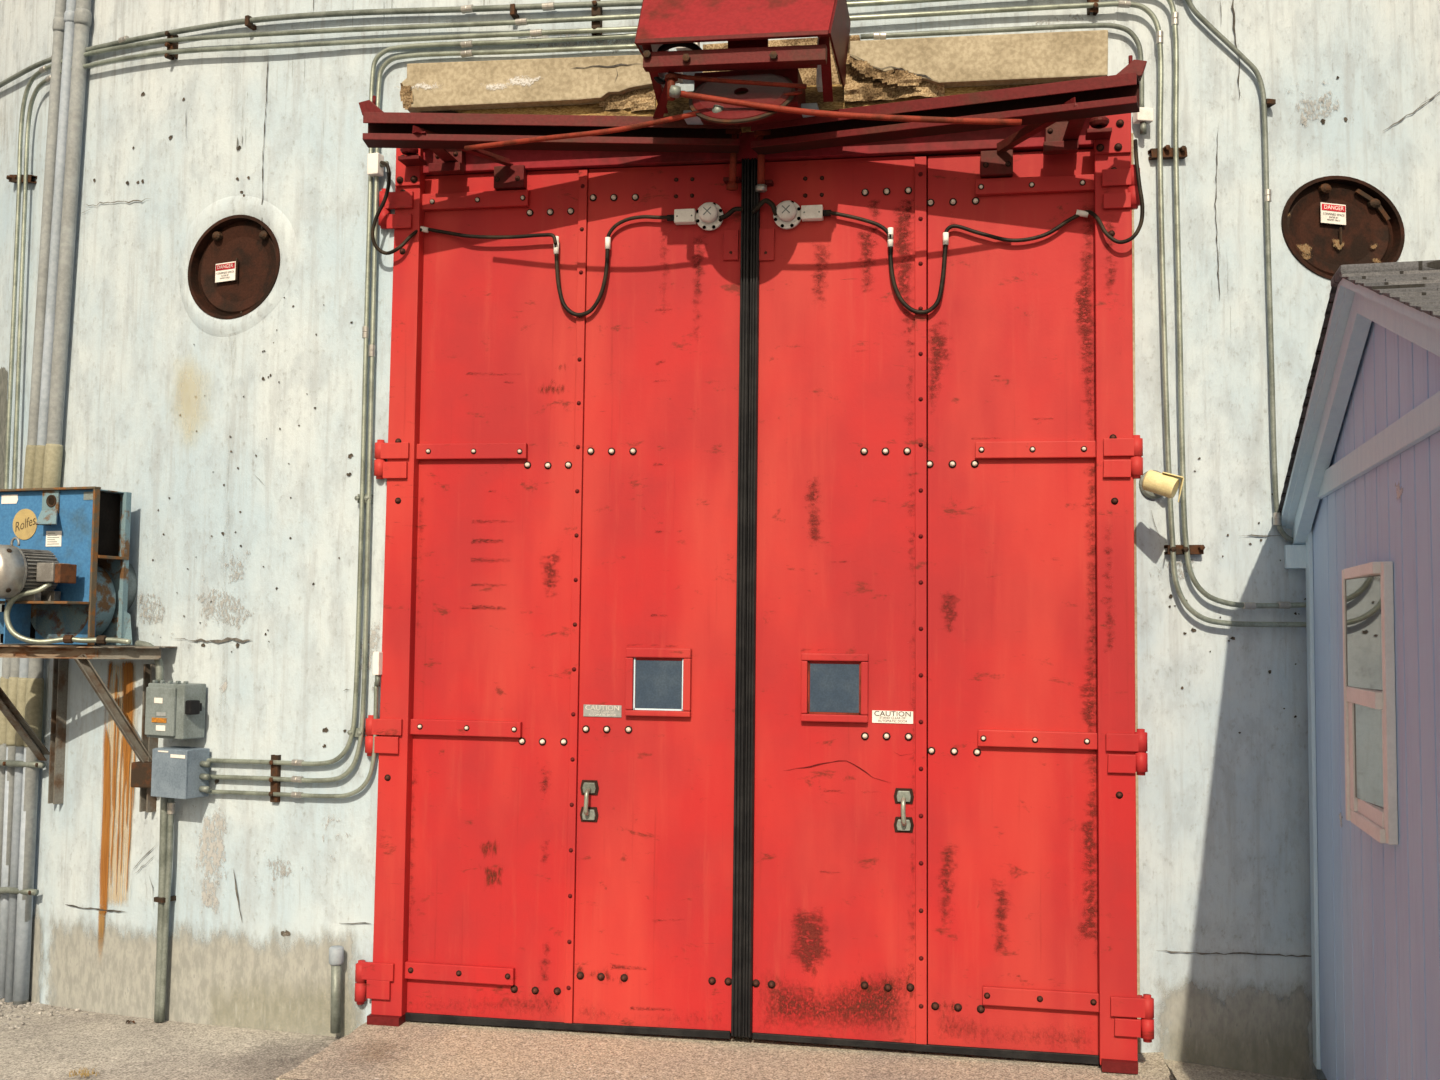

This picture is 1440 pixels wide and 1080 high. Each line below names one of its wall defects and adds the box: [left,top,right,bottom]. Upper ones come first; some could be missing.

spalling [844,53,945,102]
crack [1383,91,1440,131]
rust [1297,244,1312,260]
peeling [0,367,8,489]
rust [1084,574,1111,731]
rust [98,662,135,942]
rust [1081,750,1098,937]
rust [792,913,827,971]
rust [772,979,912,1025]